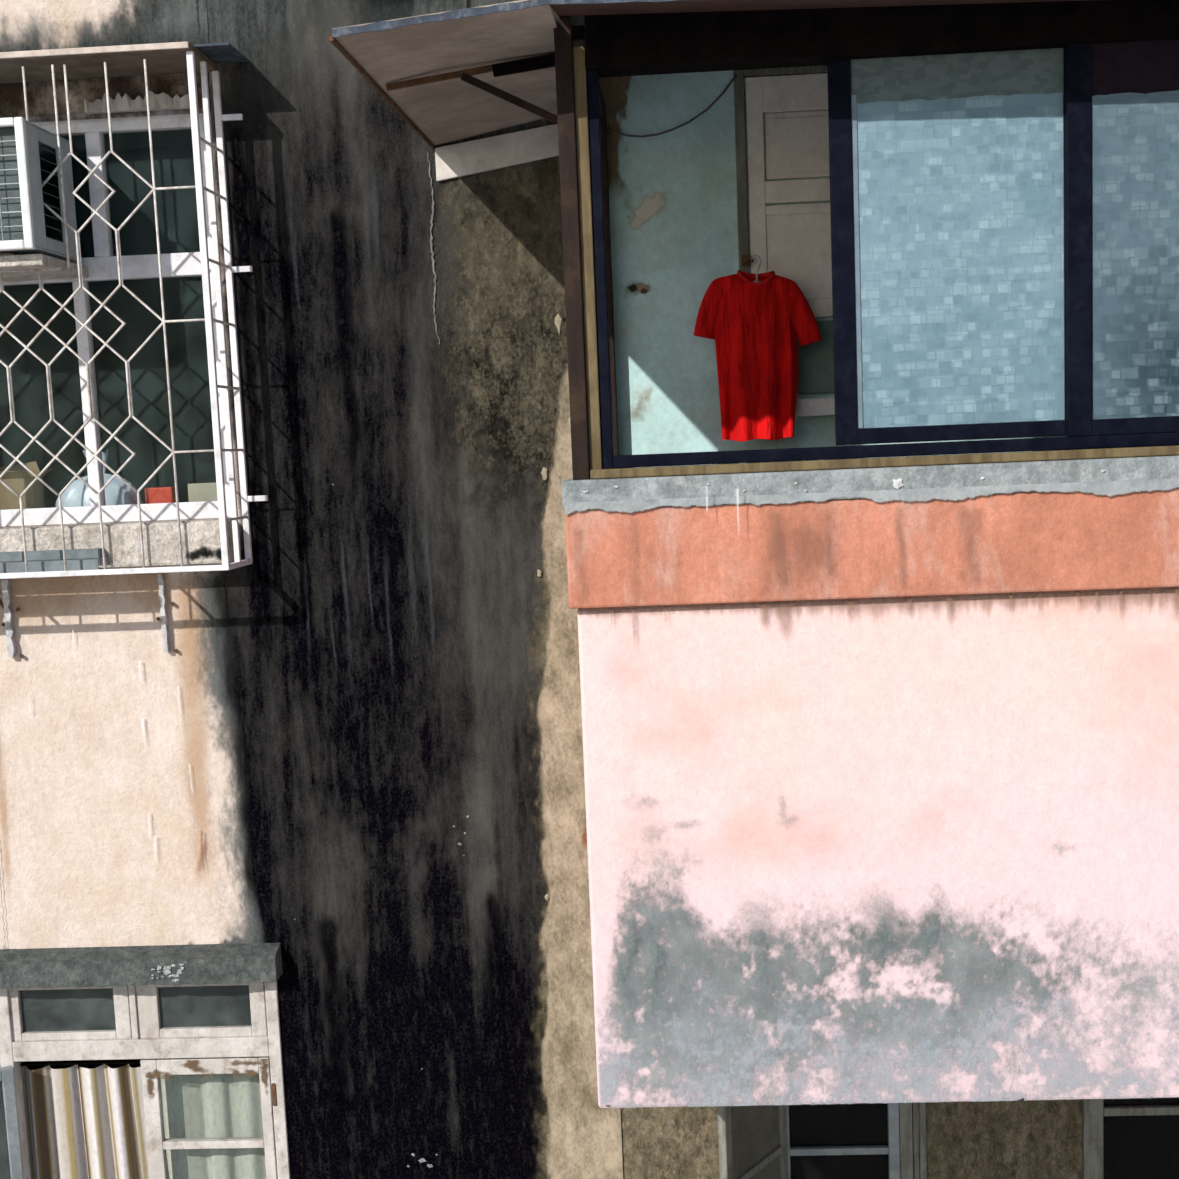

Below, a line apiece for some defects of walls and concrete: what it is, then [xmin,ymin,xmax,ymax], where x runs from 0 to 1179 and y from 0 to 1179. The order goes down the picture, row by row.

leakage [0,0,568,1179]
leakage [577,587,1179,620]
leakage [598,885,1157,1108]
leakage [1090,954,1173,1011]
peeling [146,1070,169,1097]
peeling [183,1060,204,1072]
peeling [231,1059,268,1092]